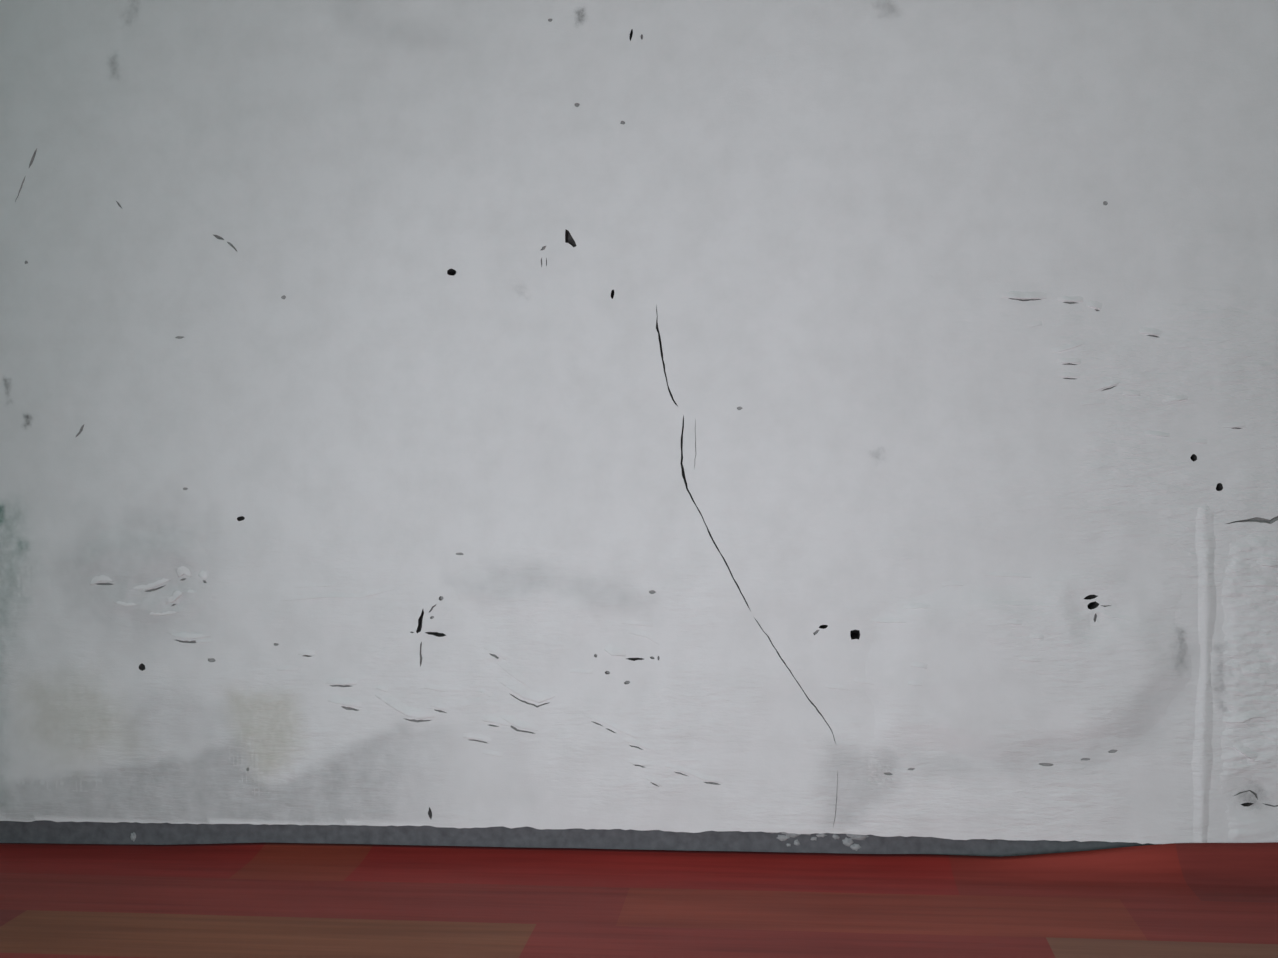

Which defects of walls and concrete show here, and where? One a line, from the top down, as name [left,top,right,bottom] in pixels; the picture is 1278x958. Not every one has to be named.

crack [656,304,836,743]
crack [1226,516,1278,524]